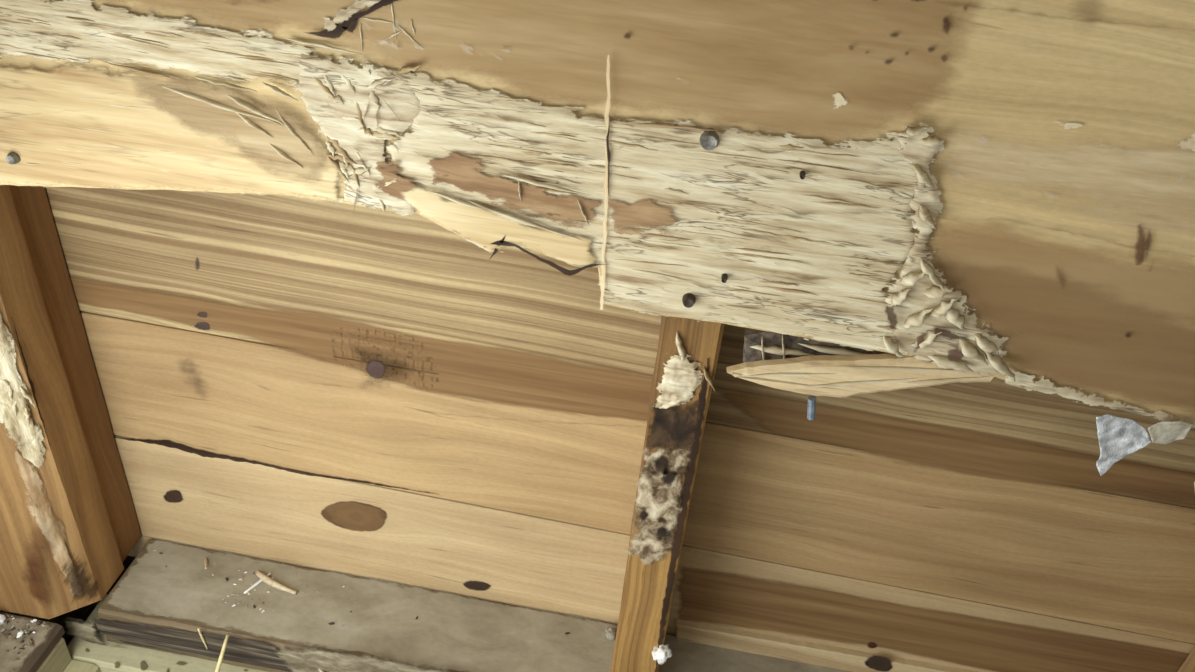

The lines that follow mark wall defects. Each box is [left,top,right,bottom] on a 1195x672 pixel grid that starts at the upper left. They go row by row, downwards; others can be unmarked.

crack [305,0,398,39]
peeling [360,3,423,52]
leakage [142,0,967,139]
spalling [833,93,847,108]
peeling [326,135,398,212]
crack [484,235,607,276]
peeling [883,257,1015,381]
crack [114,437,438,495]
leakage [69,276,700,565]
leakage [723,393,1195,506]
leakage [62,561,98,600]
leakage [679,570,1189,672]